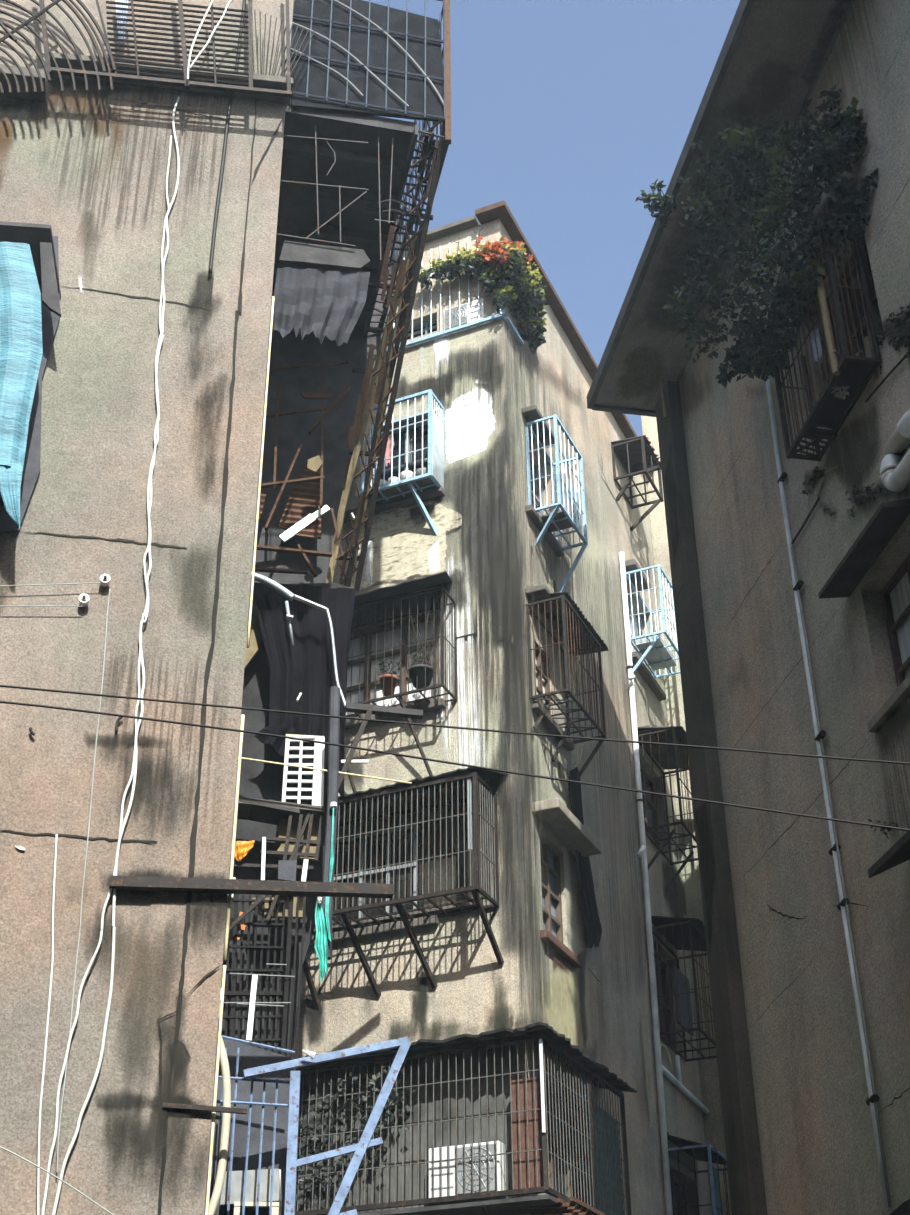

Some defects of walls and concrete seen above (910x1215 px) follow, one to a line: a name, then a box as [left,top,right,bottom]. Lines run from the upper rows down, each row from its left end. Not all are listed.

corrosion [0,121,11,153]
crack [63,286,200,307]
crack [19,531,187,549]
crack [108,98,283,1118]
water stain [396,338,625,1030]
crack [0,830,157,844]
water stain [107,869,224,892]
water stain [190,898,229,936]
water stain [390,970,460,1040]
water stain [97,995,198,1185]
crack [158,1158,166,1215]